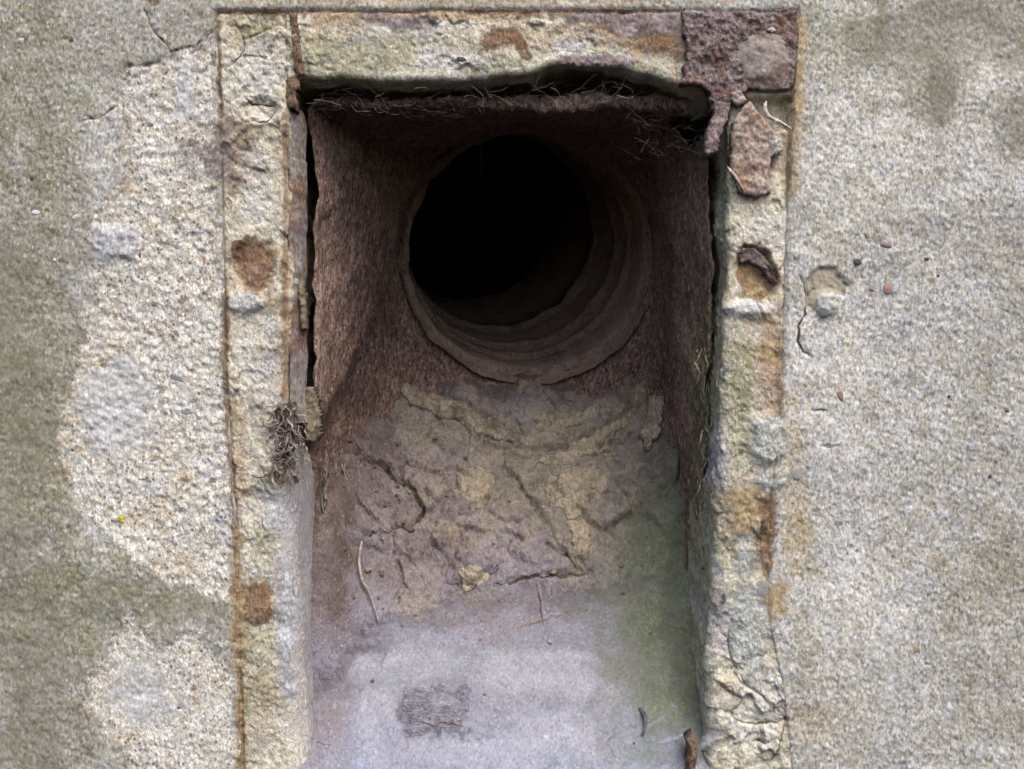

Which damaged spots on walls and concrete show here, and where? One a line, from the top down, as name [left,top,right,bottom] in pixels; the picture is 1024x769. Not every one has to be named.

crack [120,11,213,81]
corrosion [727,27,802,207]
corrosion [229,76,303,485]
spalling [806,267,846,312]
corrosion [221,295,280,769]
corrosion [730,487,788,620]
crack [722,629,785,760]